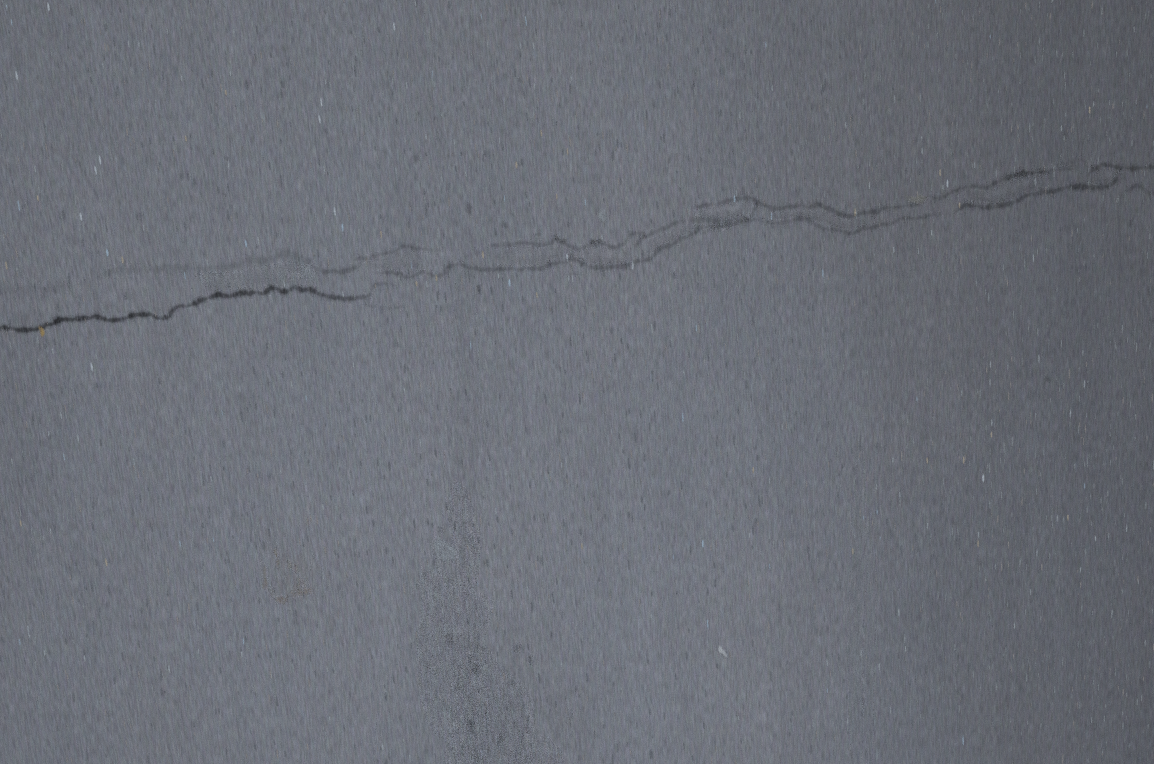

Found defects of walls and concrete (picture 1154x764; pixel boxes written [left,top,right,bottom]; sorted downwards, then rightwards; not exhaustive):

crack [707,204,742,215]
crack [193,286,315,305]
crack [3,312,166,332]